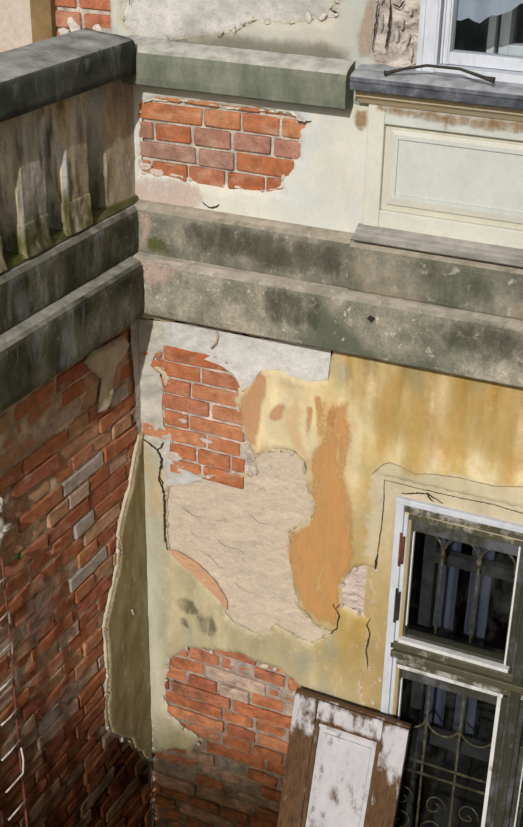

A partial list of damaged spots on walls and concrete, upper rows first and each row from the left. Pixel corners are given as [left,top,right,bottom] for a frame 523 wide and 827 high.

flaking render [55,0,111,36]
spalling [122,0,340,41]
peeling [380,0,414,62]
flaking render [138,97,307,193]
damp [144,264,168,286]
peeling [0,522,14,544]
crack [143,439,167,549]
spalling [103,319,332,745]
crack [374,480,523,569]
crack [330,603,340,634]
flaking render [148,646,301,821]